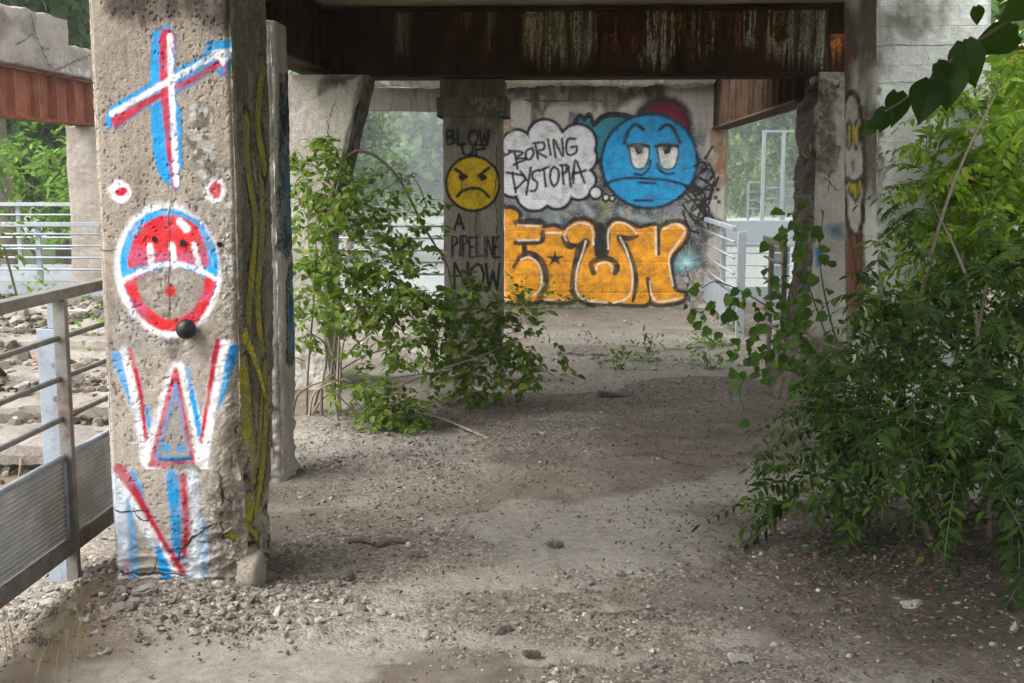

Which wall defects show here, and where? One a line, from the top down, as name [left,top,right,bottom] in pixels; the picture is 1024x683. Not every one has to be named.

crack [15,15,91,71]
corrosion [830,34,845,57]
spalling [785,79,840,323]
crack [114,473,233,576]